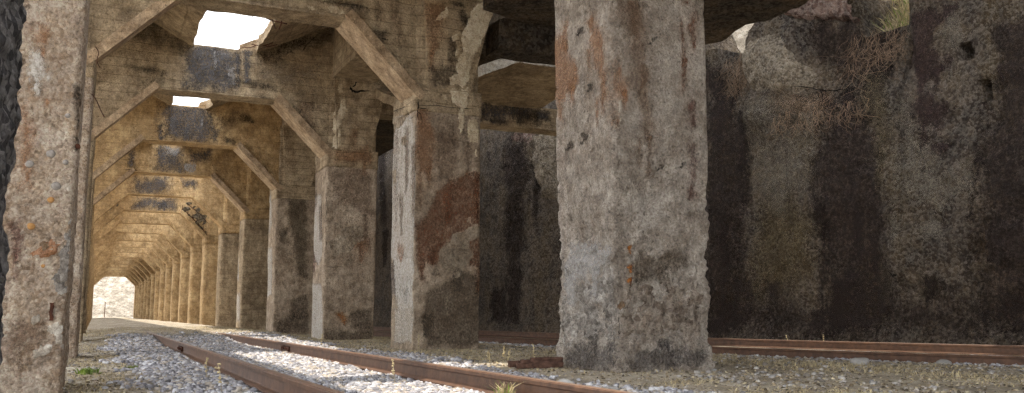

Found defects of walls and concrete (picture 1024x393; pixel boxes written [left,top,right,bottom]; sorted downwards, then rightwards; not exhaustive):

leakage [135,24,331,99]
peeling [441,2,493,157]
corrosion [555,25,577,118]
leakage [127,104,254,212]
leakage [332,118,540,348]
corrosion [399,109,480,292]
leakage [705,3,1024,345]